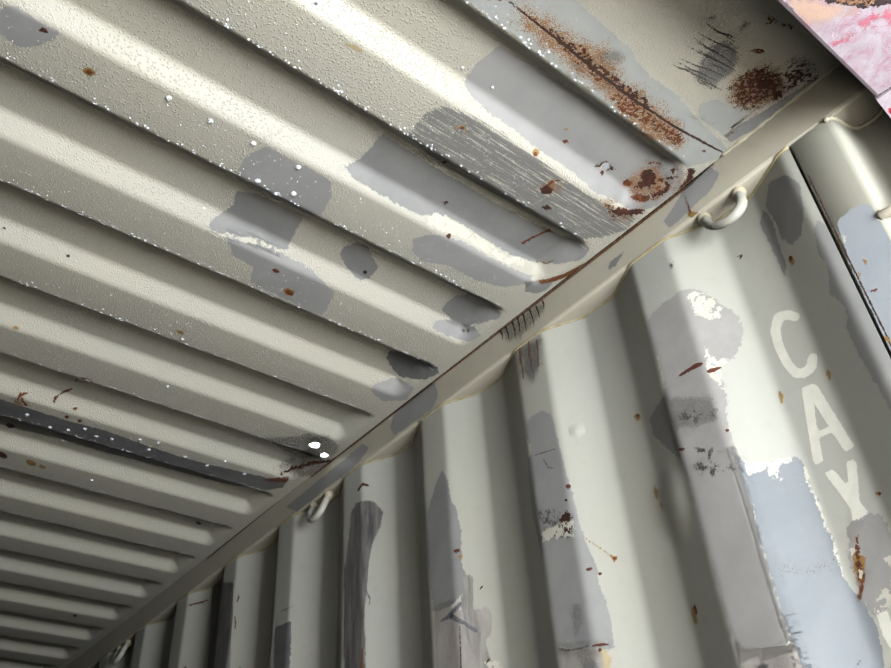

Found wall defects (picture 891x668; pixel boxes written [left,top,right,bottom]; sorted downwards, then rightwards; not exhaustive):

peeling [787,0,891,49]
corrosion [724,48,821,125]
corrosion [207,0,723,559]
spalling [686,291,723,320]
peeling [742,457,845,579]
peeling [846,521,867,543]
corrosion [849,535,866,600]
peeling [874,580,891,612]